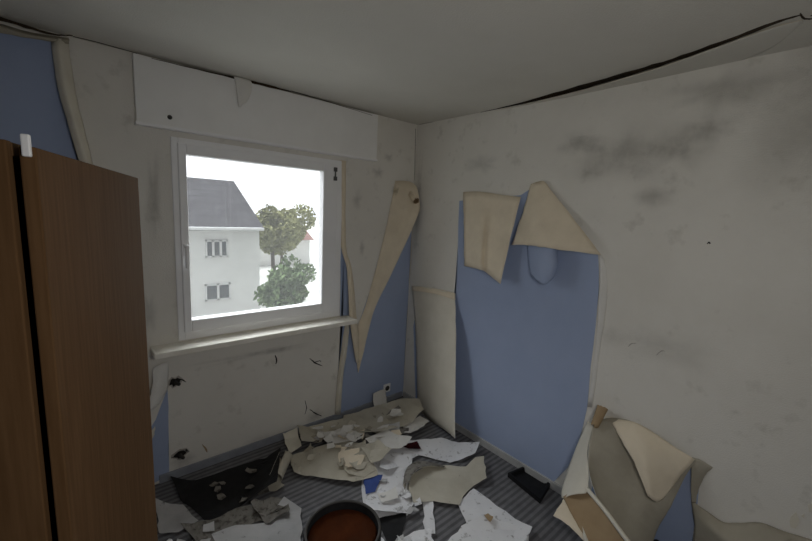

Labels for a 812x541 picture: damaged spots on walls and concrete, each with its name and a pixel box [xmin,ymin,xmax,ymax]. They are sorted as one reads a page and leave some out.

peeling [0,33,78,160]
crack [484,13,812,112]
peeling [338,231,417,412]
peeling [454,190,599,481]
peeling [654,468,699,541]